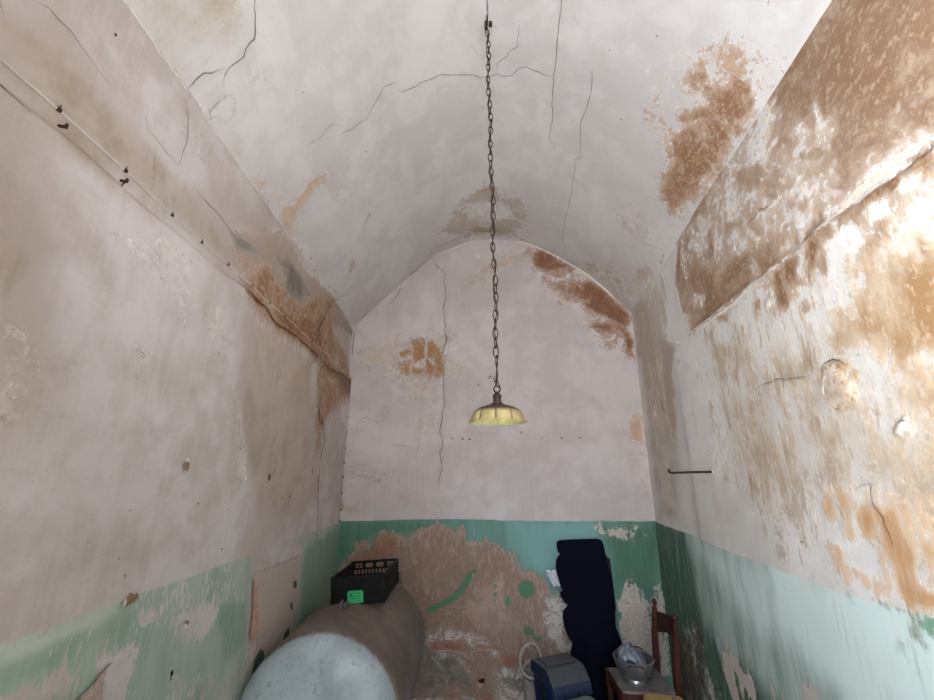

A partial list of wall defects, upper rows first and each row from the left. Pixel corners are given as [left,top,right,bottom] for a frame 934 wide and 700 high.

crack [306,0,592,256]
damp [279,257,310,302]
crack [249,284,368,493]
crack [385,231,523,484]
damp [633,292,676,437]
damp [675,0,934,561]
peeling [338,518,572,700]
peeling [586,520,647,542]
peeling [616,579,706,700]
peeling [721,640,785,700]